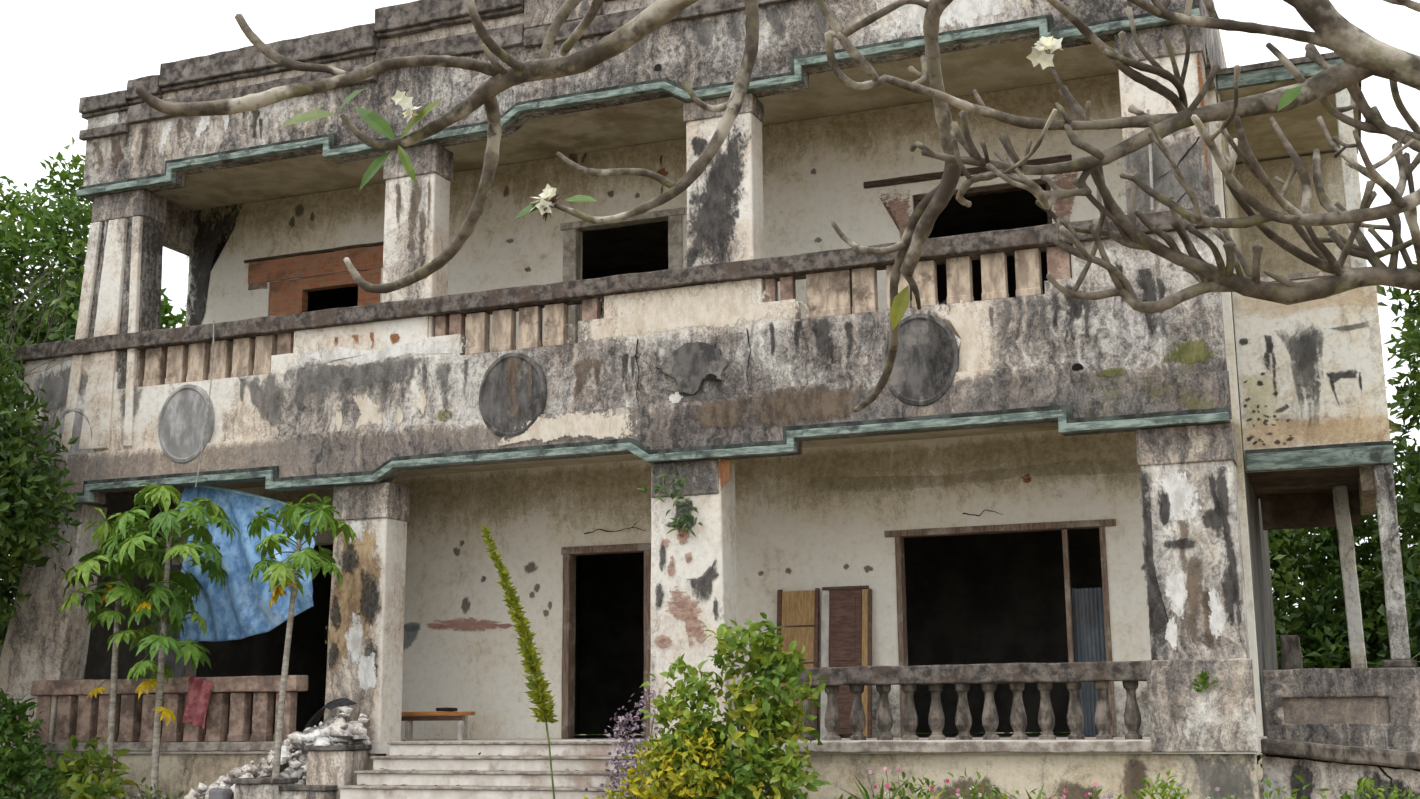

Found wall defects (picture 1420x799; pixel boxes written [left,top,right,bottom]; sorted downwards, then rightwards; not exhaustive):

water stain [92,128,148,171]
water stain [243,109,263,138]
water stain [685,120,751,267]
water stain [239,354,468,429]
water stain [498,353,640,446]
water stain [689,386,861,427]
water stain [794,318,854,369]
water stain [1239,322,1367,445]
water stain [329,544,381,676]
flaking render [654,635,671,648]
flaking render [662,528,707,647]
water stain [1139,466,1241,660]